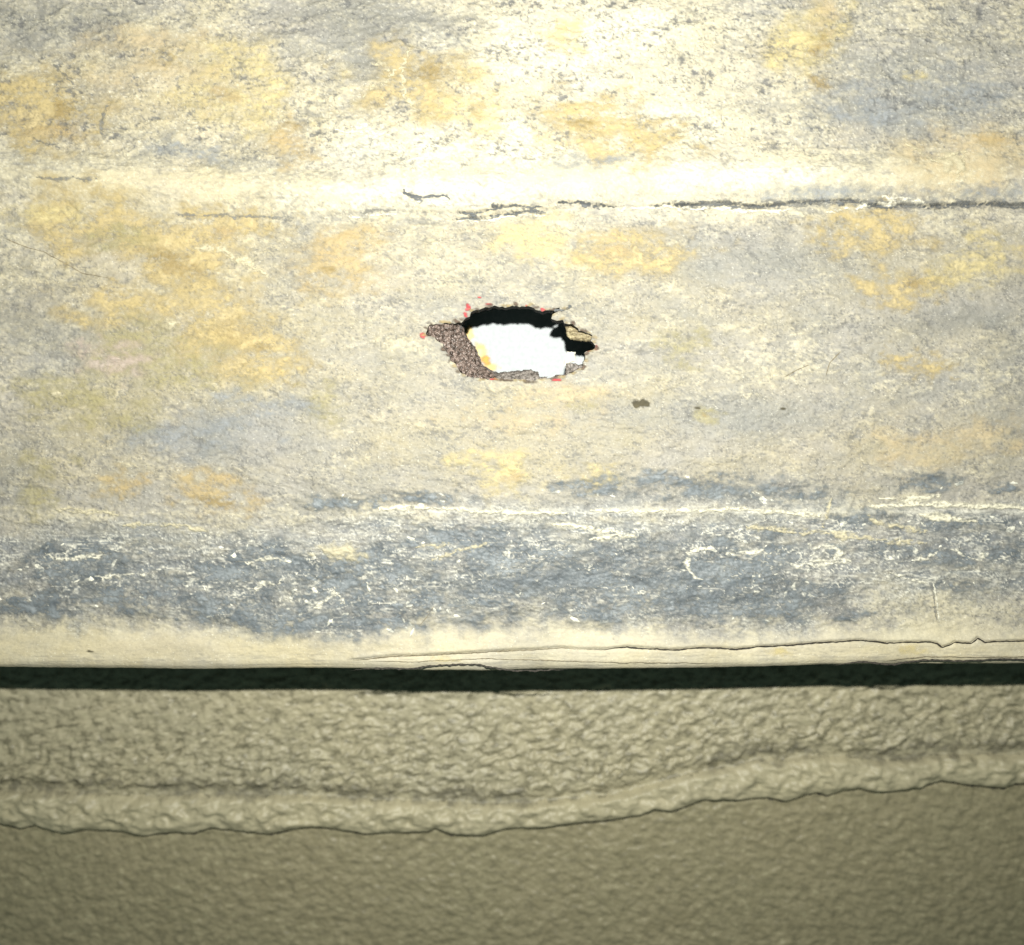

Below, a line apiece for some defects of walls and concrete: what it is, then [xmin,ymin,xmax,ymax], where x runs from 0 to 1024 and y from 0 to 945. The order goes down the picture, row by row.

crack [178,212,290,221]
crack [361,189,614,221]
crack [653,198,1024,211]
crack [351,572,1024,672]
crack [928,781,1022,790]
crack [567,789,871,825]